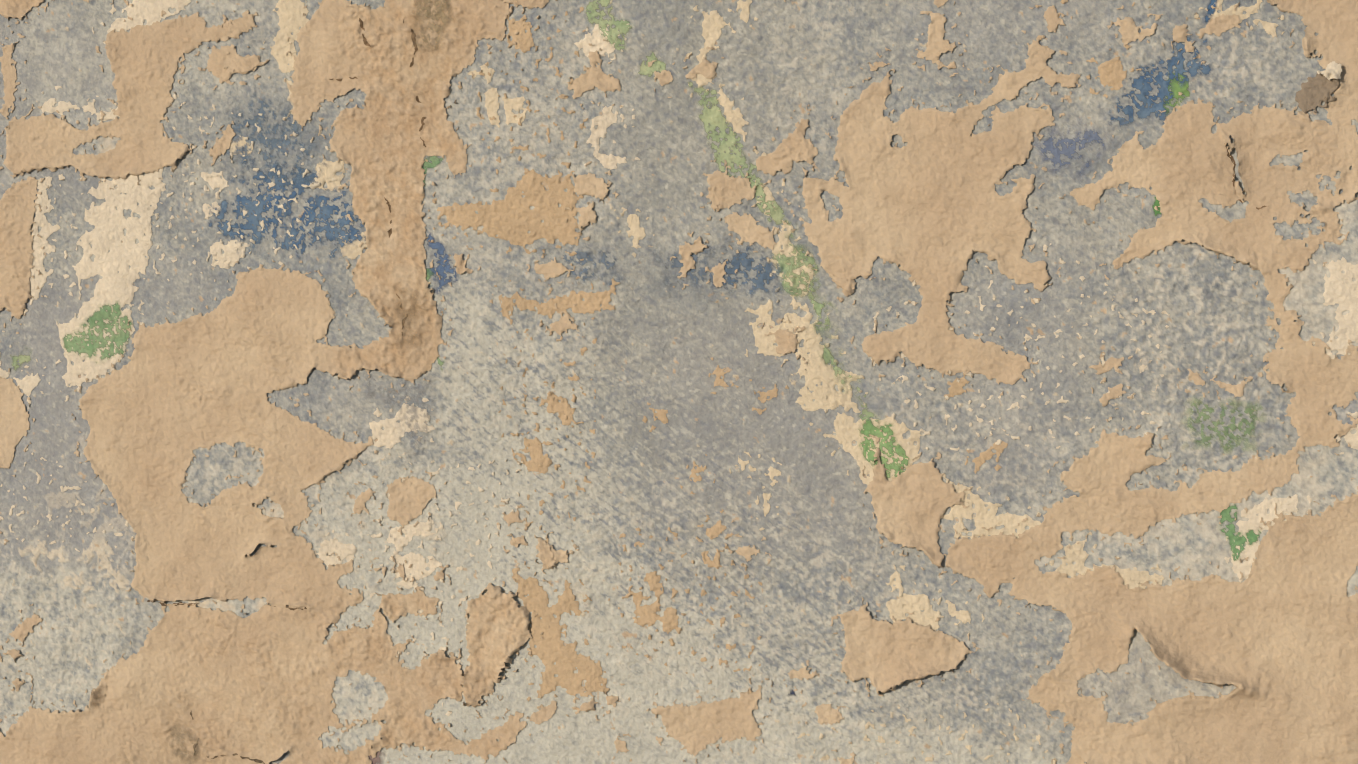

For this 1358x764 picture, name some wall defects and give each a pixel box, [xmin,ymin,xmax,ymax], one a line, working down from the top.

peeling [0,0,632,764]
peeling [701,520,772,569]
peeling [763,492,772,517]
peeling [646,597,980,764]
peeling [670,0,1090,410]
peeling [862,0,1358,764]